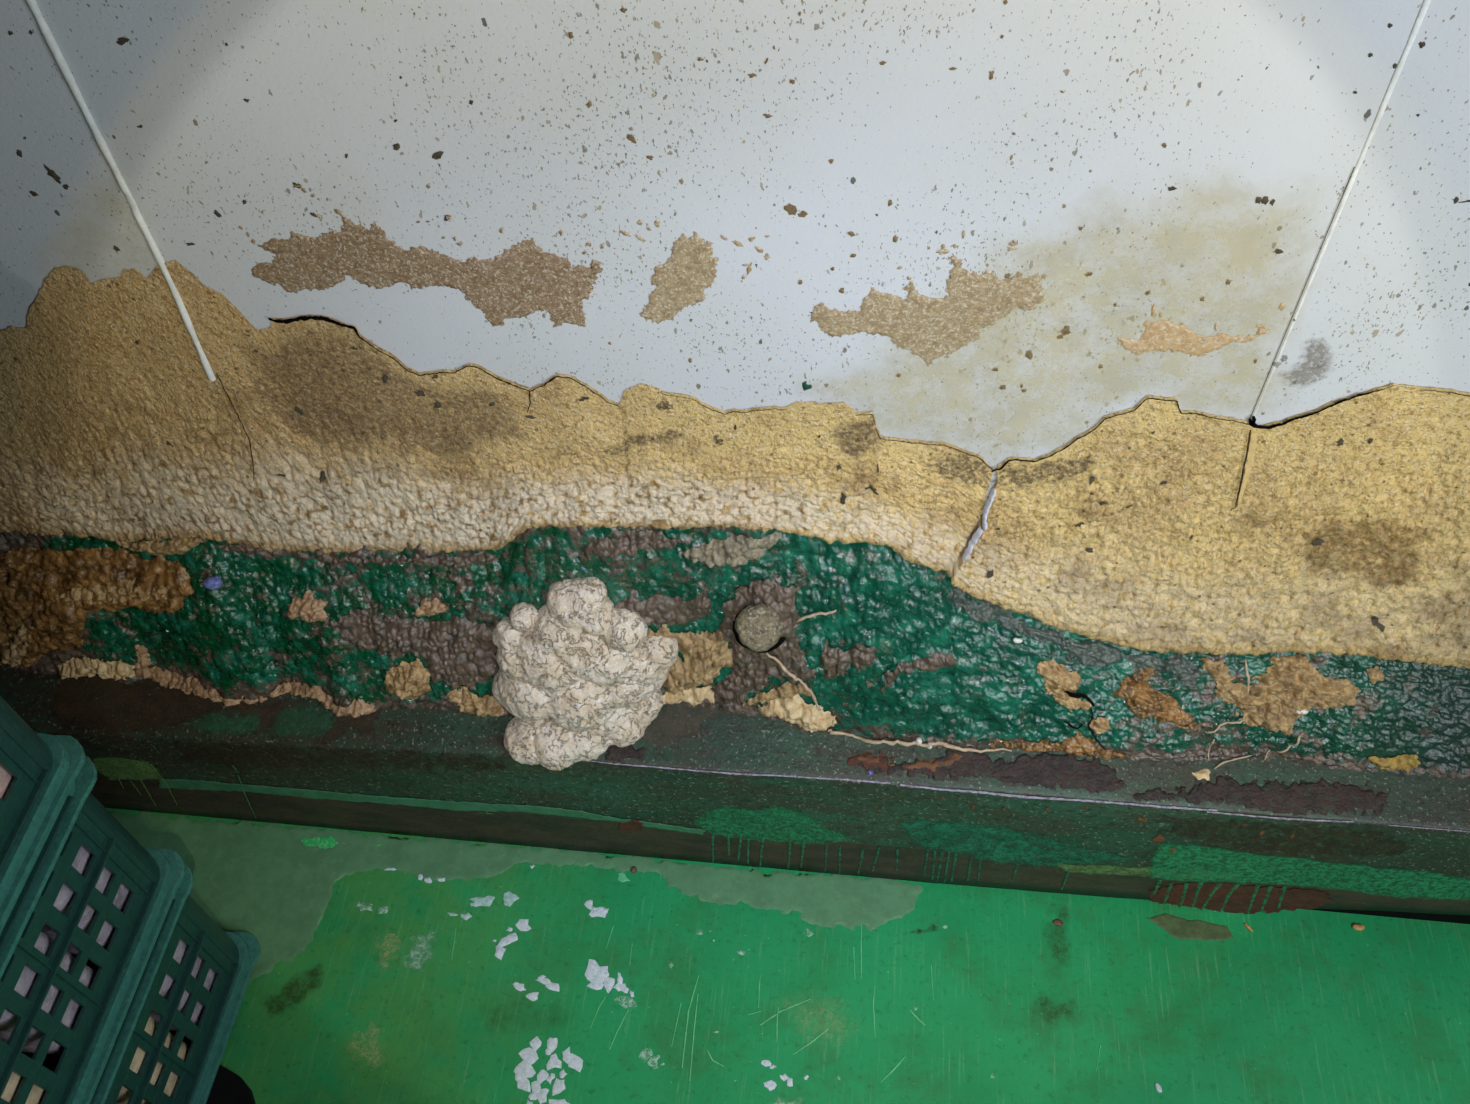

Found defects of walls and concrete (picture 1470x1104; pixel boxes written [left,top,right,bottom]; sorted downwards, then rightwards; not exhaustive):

peeling [239,185,604,328]
peeling [639,231,770,324]
peeling [809,231,1047,366]
crack [268,316,619,413]
crack [664,394,786,415]
crack [855,386,1470,510]
peeling [0,260,1385,760]
corrosion [1148,882,1332,914]
peeling [513,975,559,1001]
peeling [584,959,637,1008]
peeling [513,1036,583,1104]
peeling [761,1060,809,1091]